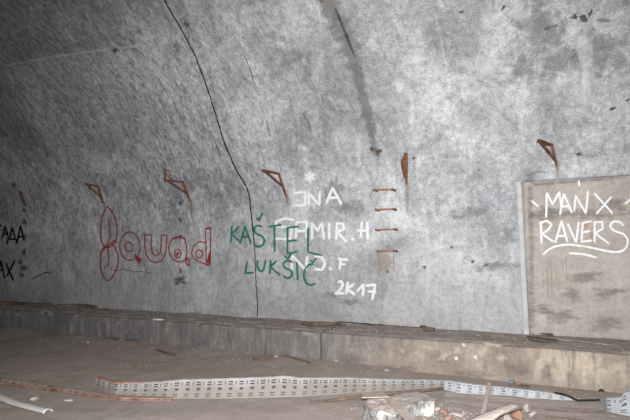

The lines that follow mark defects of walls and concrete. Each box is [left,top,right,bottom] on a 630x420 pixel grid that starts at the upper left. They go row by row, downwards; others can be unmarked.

crack [164,0,258,317]
leakage [322,0,375,144]